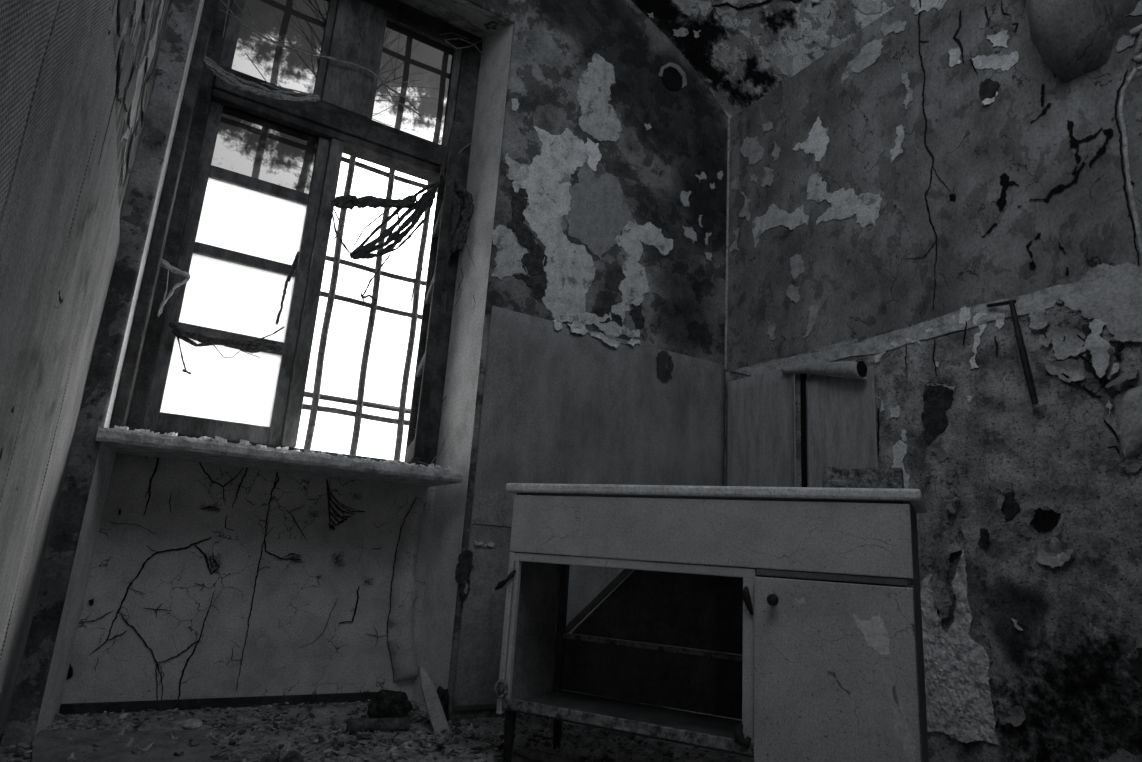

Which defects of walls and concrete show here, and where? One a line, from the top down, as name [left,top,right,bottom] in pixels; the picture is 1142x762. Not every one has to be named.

peeling [117,0,164,185]
peeling [491,53,882,345]
crack [712,0,801,10]
peeling [841,0,948,84]
crack [902,0,1018,310]
peeling [948,30,1019,71]
crack [874,408,882,455]
flaking render [920,380,973,514]
peeling [1029,301,1124,415]
crack [79,457,306,700]
crack [300,497,417,683]
damp [979,584,1142,762]